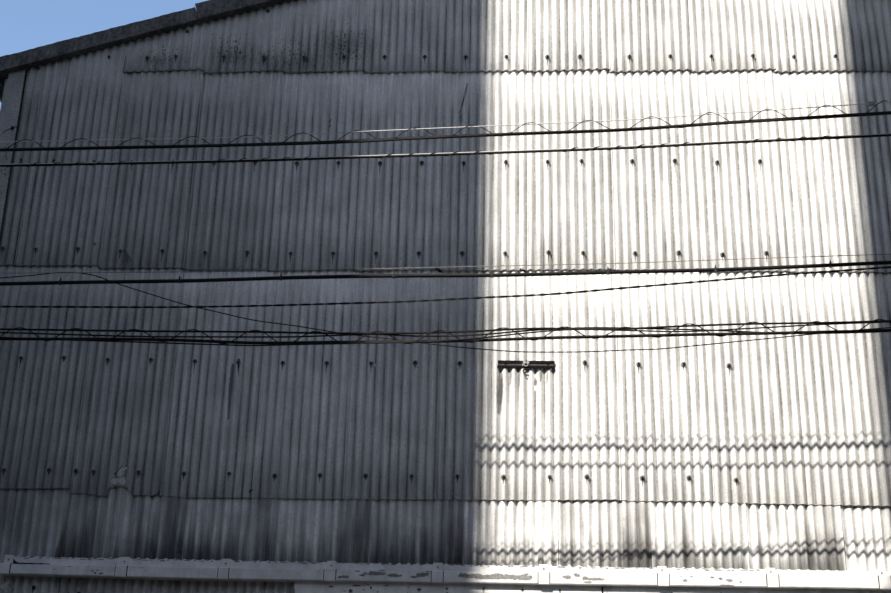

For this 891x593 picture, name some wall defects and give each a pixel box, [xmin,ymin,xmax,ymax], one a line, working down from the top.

water stain [498,371,520,414]
peeling [449,564,534,581]